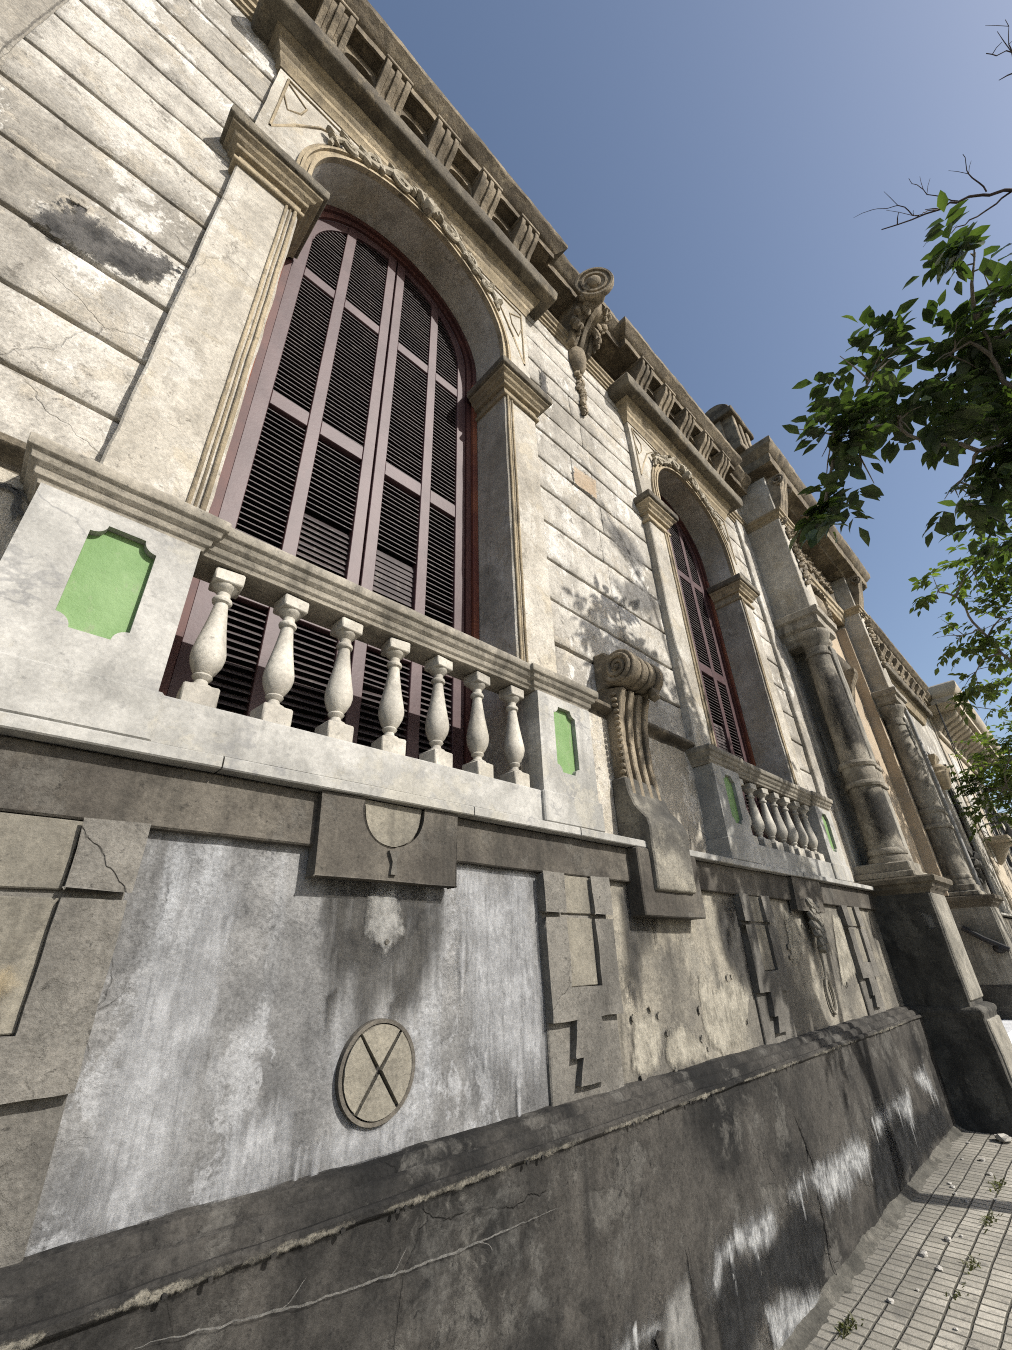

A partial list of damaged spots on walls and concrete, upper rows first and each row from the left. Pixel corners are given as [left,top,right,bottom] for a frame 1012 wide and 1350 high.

leakage [325,880,444,1038]
leakage [462,876,540,1117]
crack [135,1208,556,1349]
leakage [714,1069,950,1350]